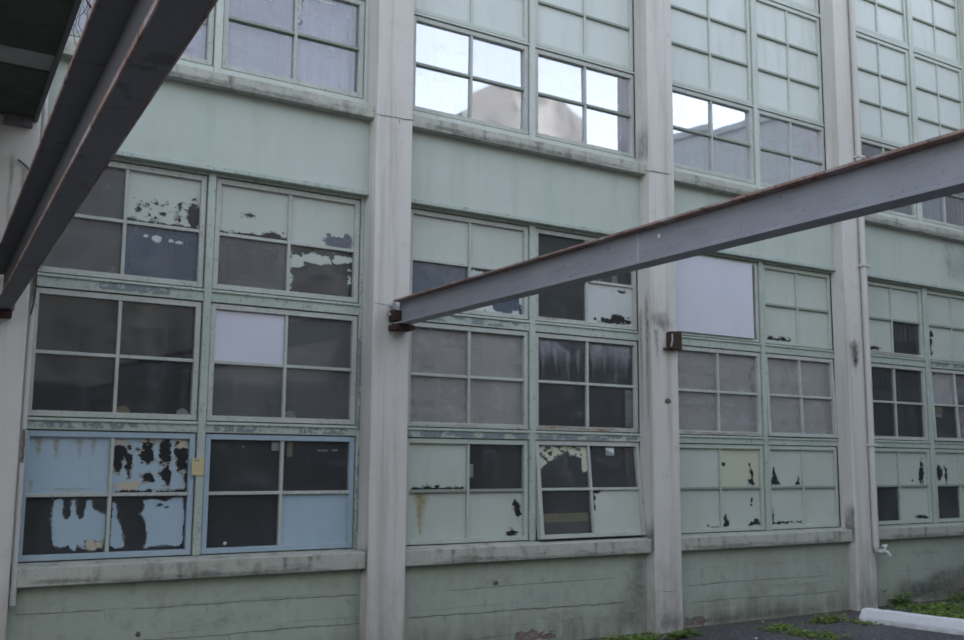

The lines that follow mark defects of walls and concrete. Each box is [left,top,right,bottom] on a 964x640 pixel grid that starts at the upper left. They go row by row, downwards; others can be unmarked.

peeling [127,197,199,246]
peeling [220,230,287,241]
peeling [289,233,353,290]
peeling [432,298,526,327]
peeling [407,428,637,480]
peeling [41,421,189,552]
peeling [747,462,755,506]
peeling [771,467,781,486]
spalling [514,629,556,640]